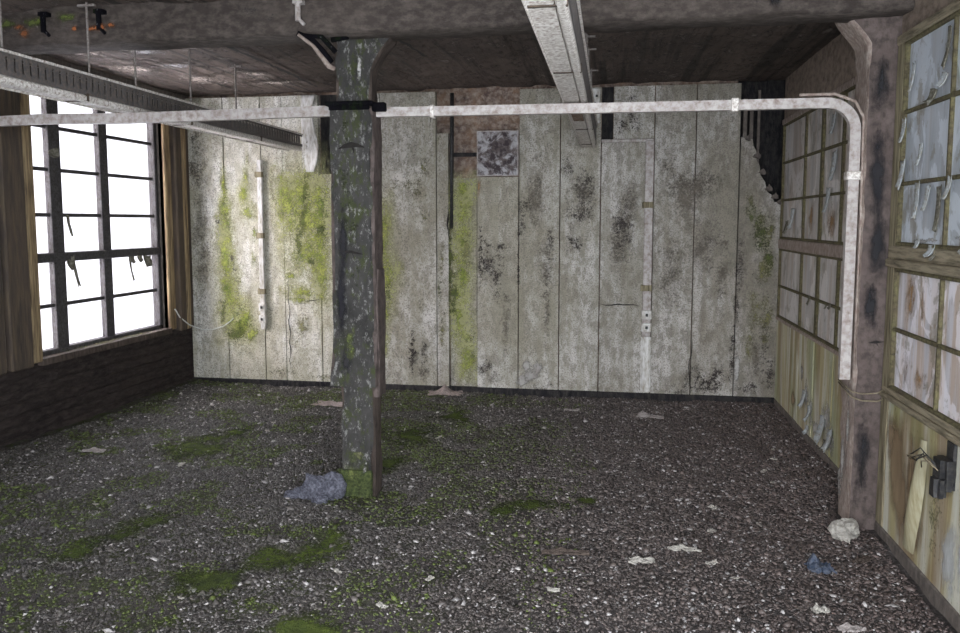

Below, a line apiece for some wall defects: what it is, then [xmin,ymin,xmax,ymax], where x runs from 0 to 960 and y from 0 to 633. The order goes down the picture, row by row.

leakage [877,61,889,101]
leakage [295,183,308,254]
leakage [560,158,594,222]
leakage [612,191,635,263]
leakage [870,135,886,270]
leakage [337,219,347,329]
leakage [220,300,260,341]
leakage [864,287,877,326]
leakage [856,433,869,485]